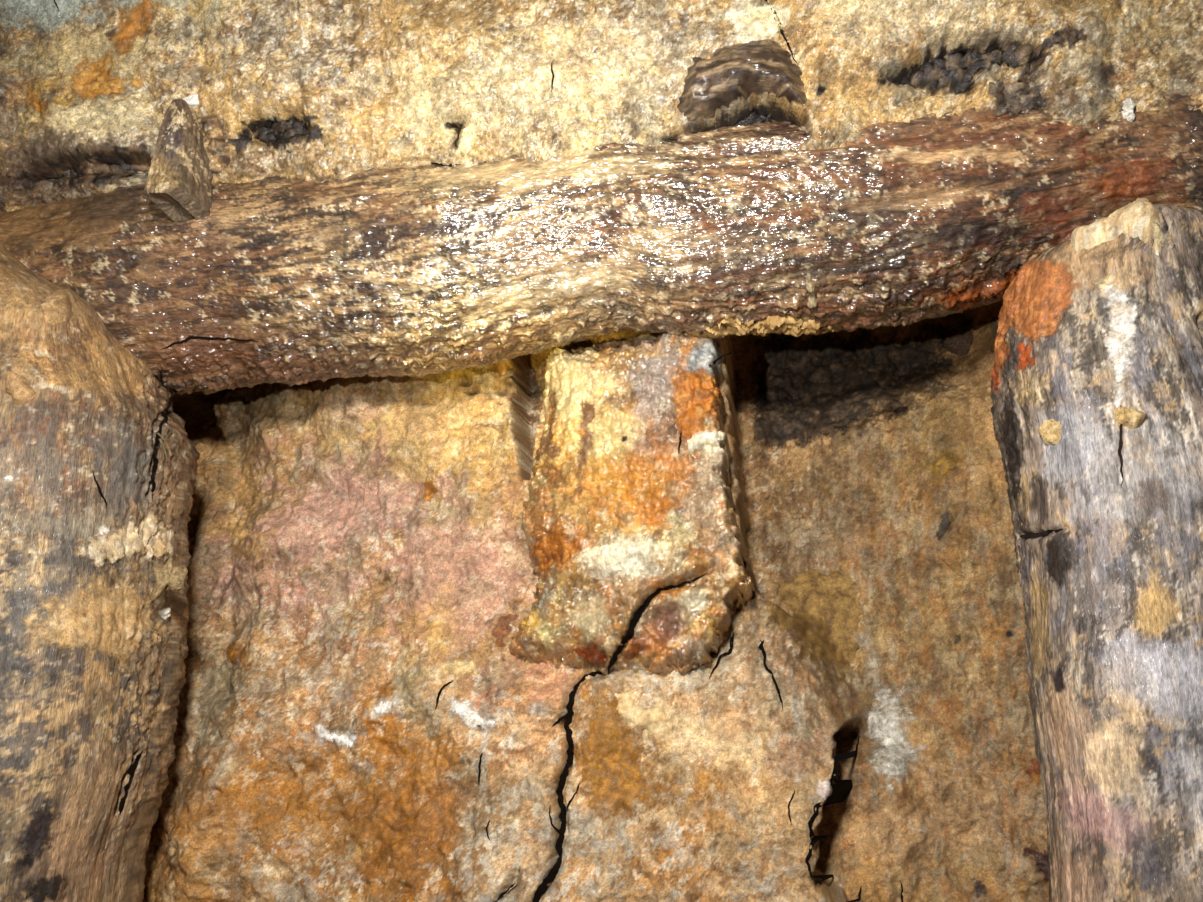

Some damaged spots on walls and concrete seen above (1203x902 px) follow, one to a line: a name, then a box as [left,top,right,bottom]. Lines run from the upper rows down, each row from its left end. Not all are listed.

corrosion [935,256,1079,391]
water stain [1095,275,1138,408]
corrosion [672,368,728,454]
corrosion [530,529,581,580]
corrosion [575,642,607,667]
corrosion [623,641,641,663]
crack [709,633,783,710]
crack [476,752,484,784]
crack [493,572,708,902]
crack [788,734,861,902]